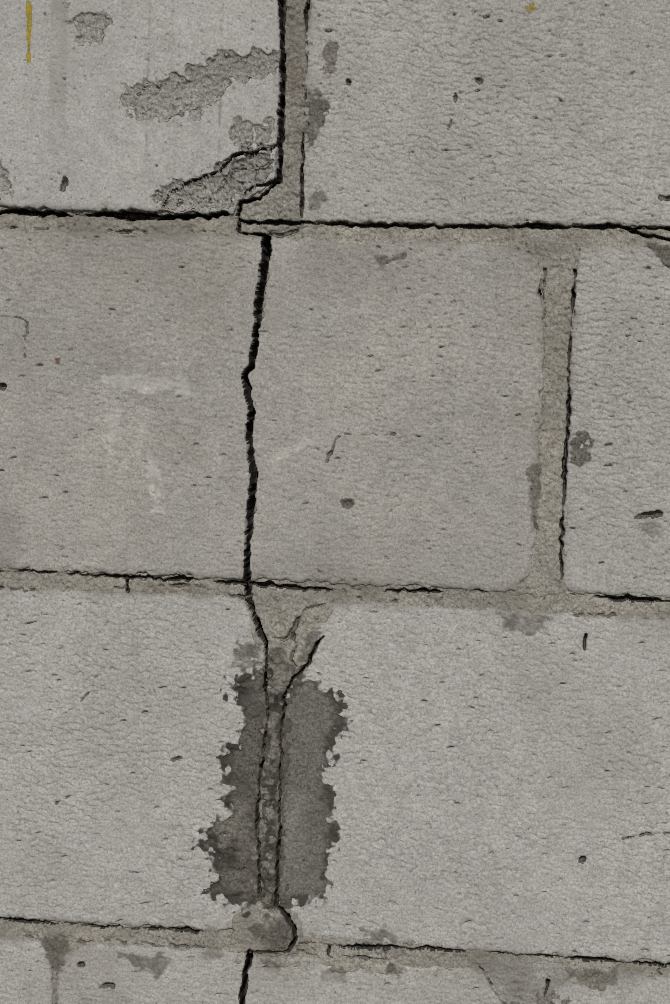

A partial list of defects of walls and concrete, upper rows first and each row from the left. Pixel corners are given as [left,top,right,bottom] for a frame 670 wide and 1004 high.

spalling [62,2,113,50]
spalling [120,42,287,128]
spalling [150,114,279,219]
crack [0,208,72,218]
crack [79,210,230,233]
crack [162,0,670,1004]
crack [0,567,56,575]
crack [69,571,201,593]
water stain [191,653,353,917]